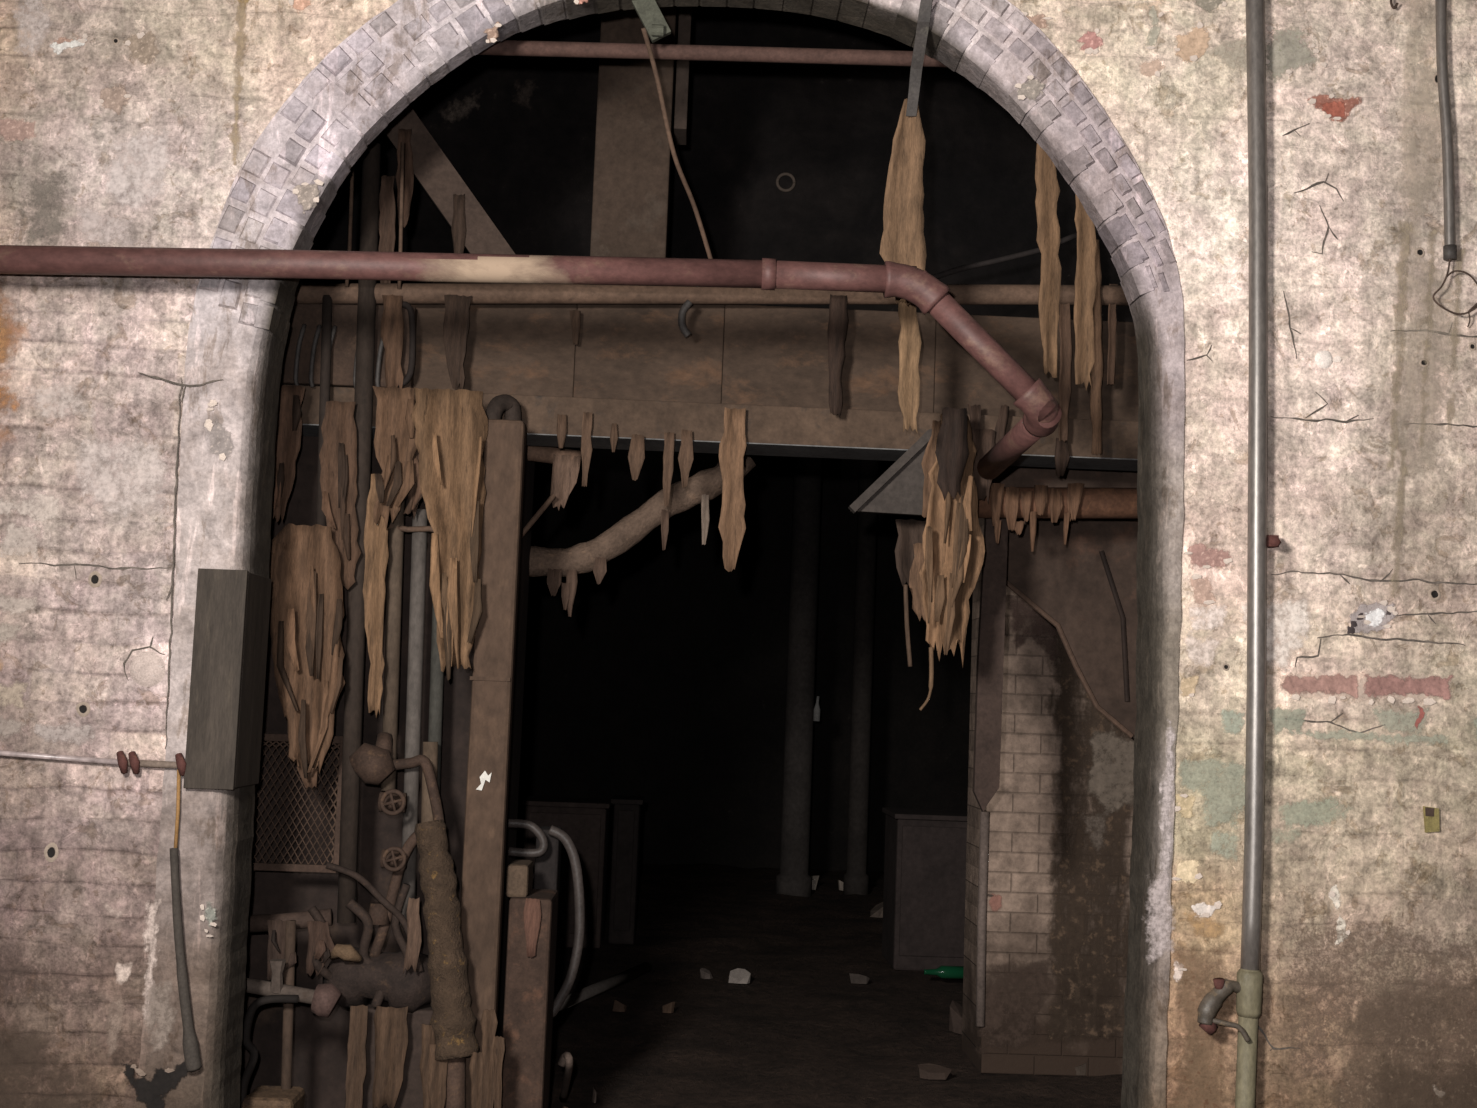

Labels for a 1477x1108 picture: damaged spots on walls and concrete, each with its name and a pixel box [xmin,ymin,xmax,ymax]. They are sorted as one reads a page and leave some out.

crack [1294,173,1344,254]
peeling [1180,543,1247,697]
spalling [1266,600,1453,745]
crack [1271,569,1477,667]
damp [980,595,1134,1050]
damp [1148,722,1227,1108]
spalling [123,1061,188,1108]
damp [1291,917,1477,1108]